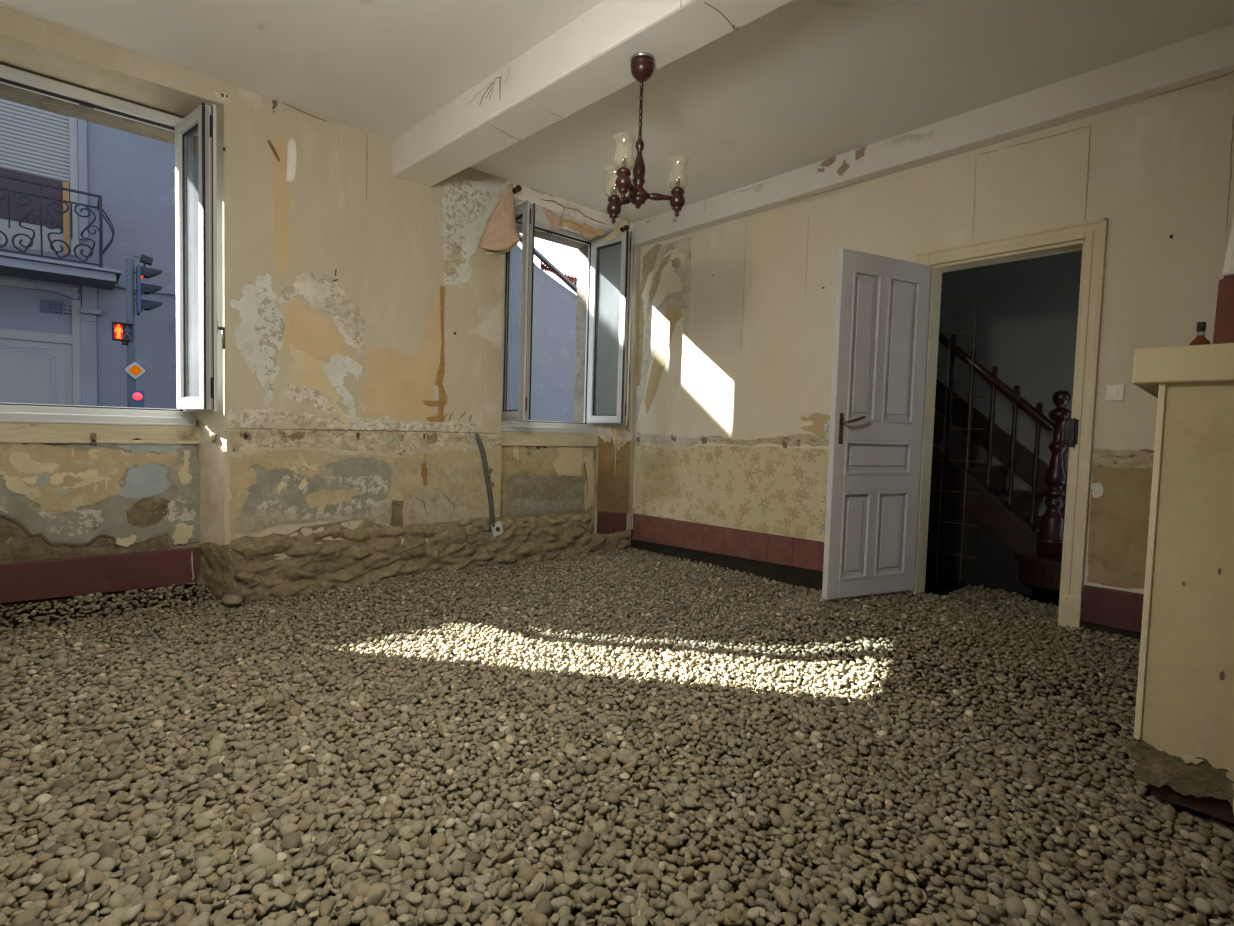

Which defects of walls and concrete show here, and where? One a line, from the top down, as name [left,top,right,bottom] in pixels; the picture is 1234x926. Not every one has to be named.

peeling [817,146,865,176]
flaking render [0,131,507,600]
peeling [597,237,692,450]
peeling [782,413,830,448]
spalling [1126,739,1234,808]